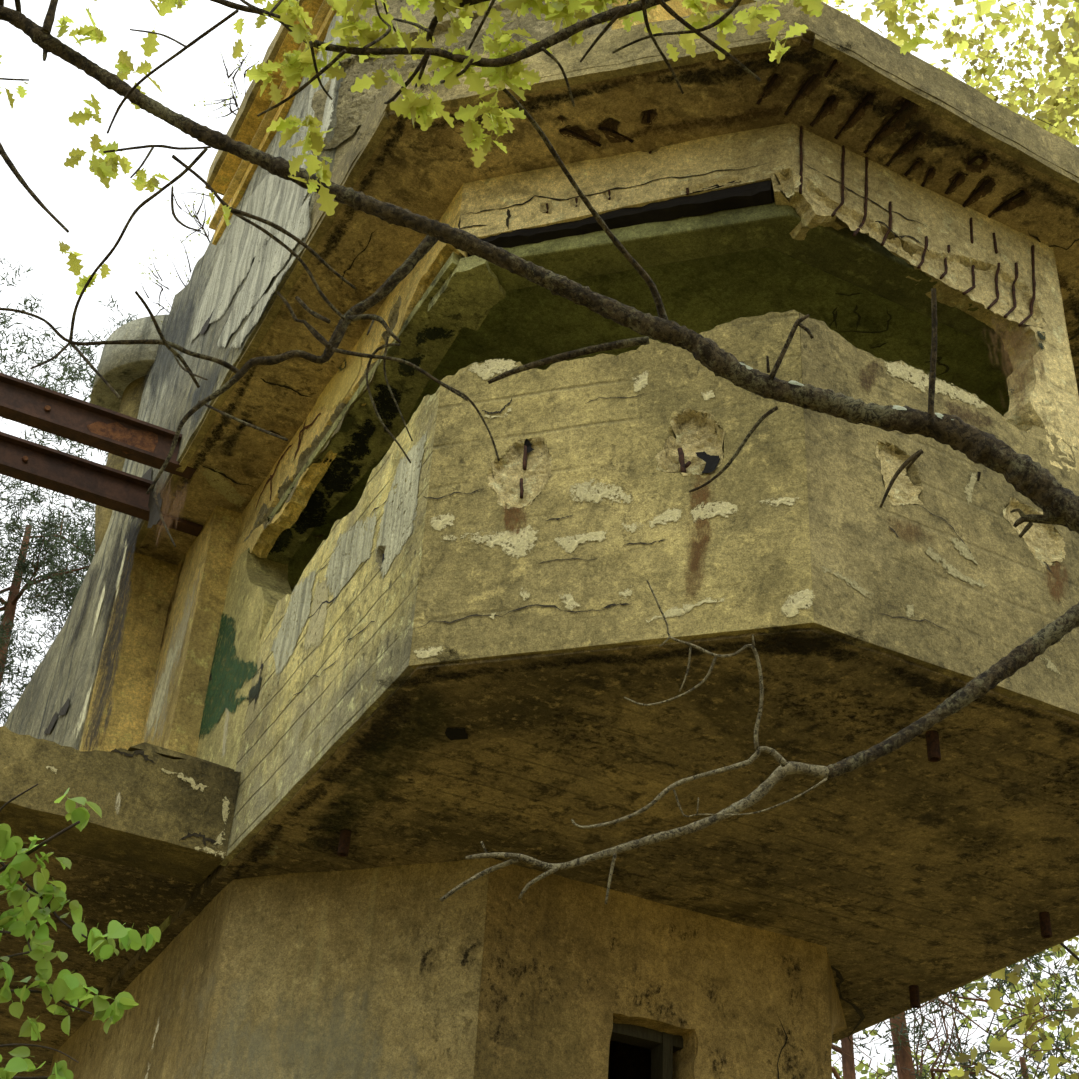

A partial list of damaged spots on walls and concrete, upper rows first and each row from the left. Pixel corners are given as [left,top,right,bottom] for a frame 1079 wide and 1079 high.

spalling [775,86,1047,409]
leakage [1059,276,1079,395]
spalling [655,390,725,476]
peeling [270,431,427,680]
spalling [429,437,553,559]
rust [686,475,710,595]
spalling [1003,497,1066,574]
peeling [199,612,262,739]
crack [413,603,630,629]
leakage [232,626,961,879]
leakage [974,696,1077,733]
crack [775,1008,788,1079]